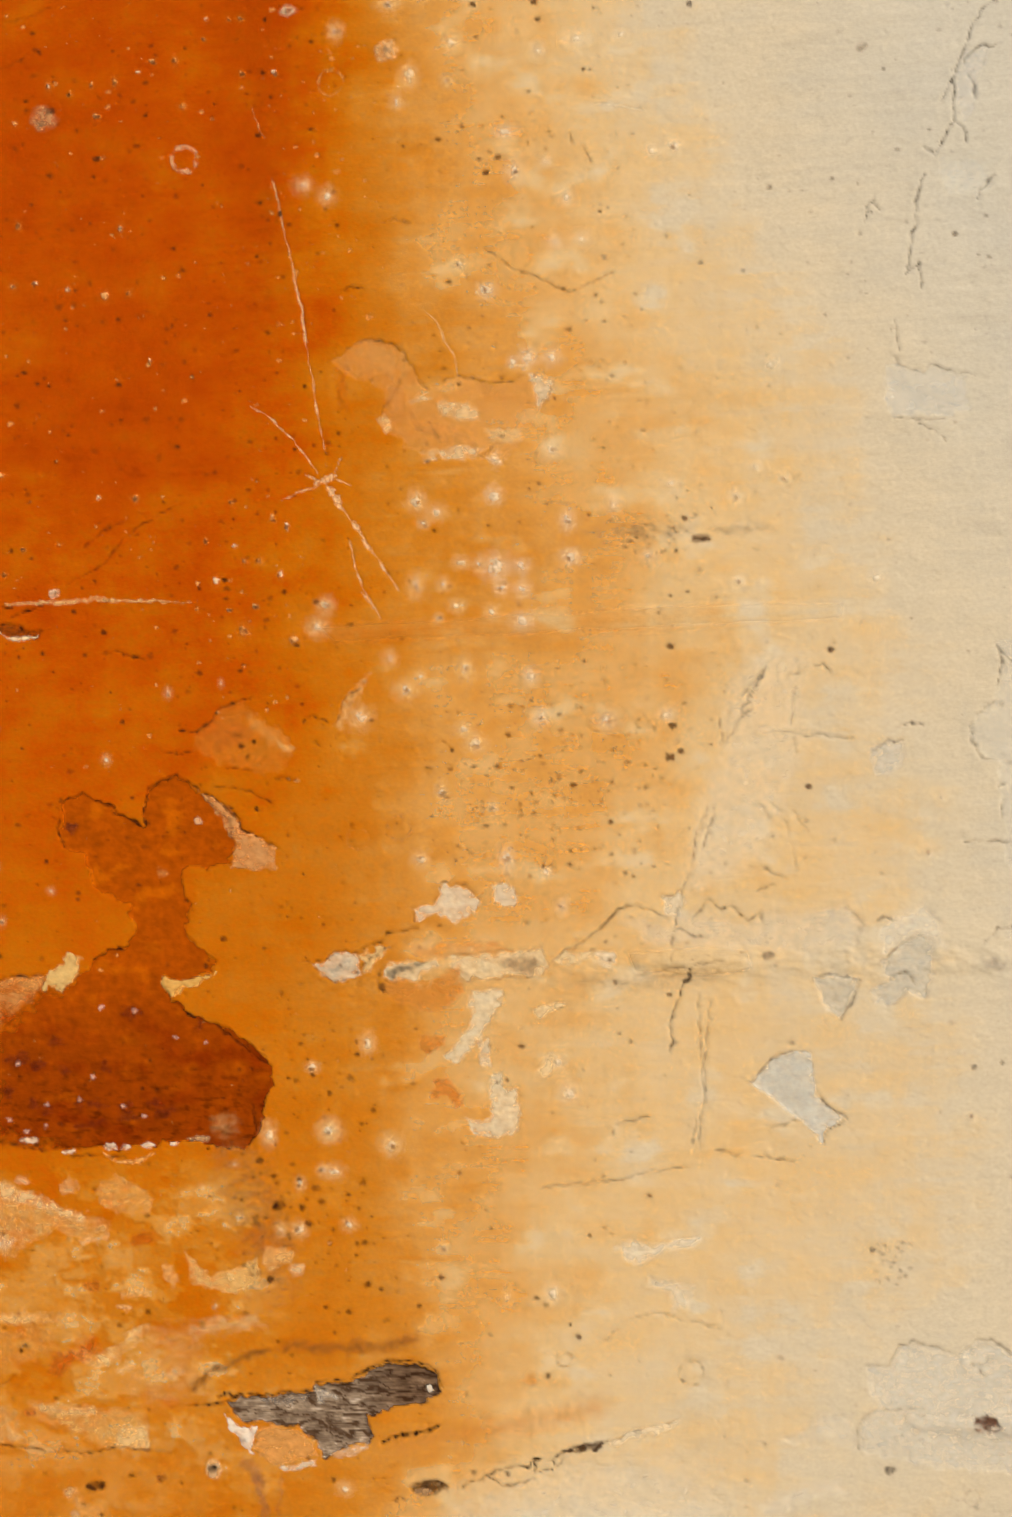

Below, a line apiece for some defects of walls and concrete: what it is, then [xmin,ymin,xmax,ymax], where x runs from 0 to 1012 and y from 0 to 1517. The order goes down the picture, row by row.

corrosion [0,0,643,1517]
peeling [425,888,478,918]
peeling [0,775,274,1163]
peeling [753,1051,839,1142]
spalling [228,1363,441,1470]